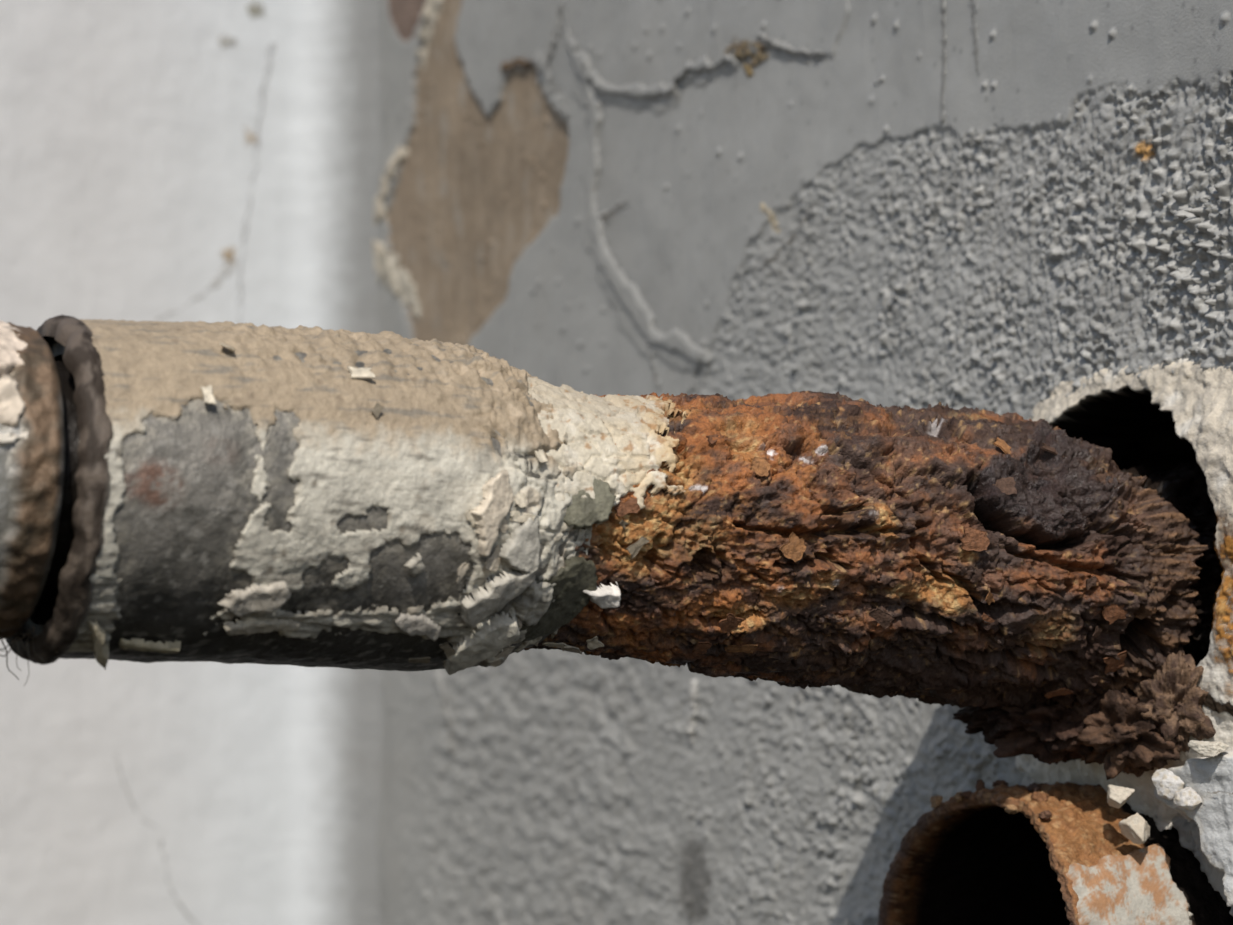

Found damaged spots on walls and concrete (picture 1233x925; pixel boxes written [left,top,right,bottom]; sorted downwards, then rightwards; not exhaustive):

peeling [372,0,570,345]
crack [544,0,826,390]
peeling [200,385,216,405]
peeling [347,367,375,379]
rust [992,477,1017,495]
rust [779,532,806,562]
rust [960,527,990,552]
peeling [87,619,181,669]
peeling [218,581,301,636]
peeling [394,470,629,675]
rust [1092,604,1127,638]
rust [1213,517,1233,674]